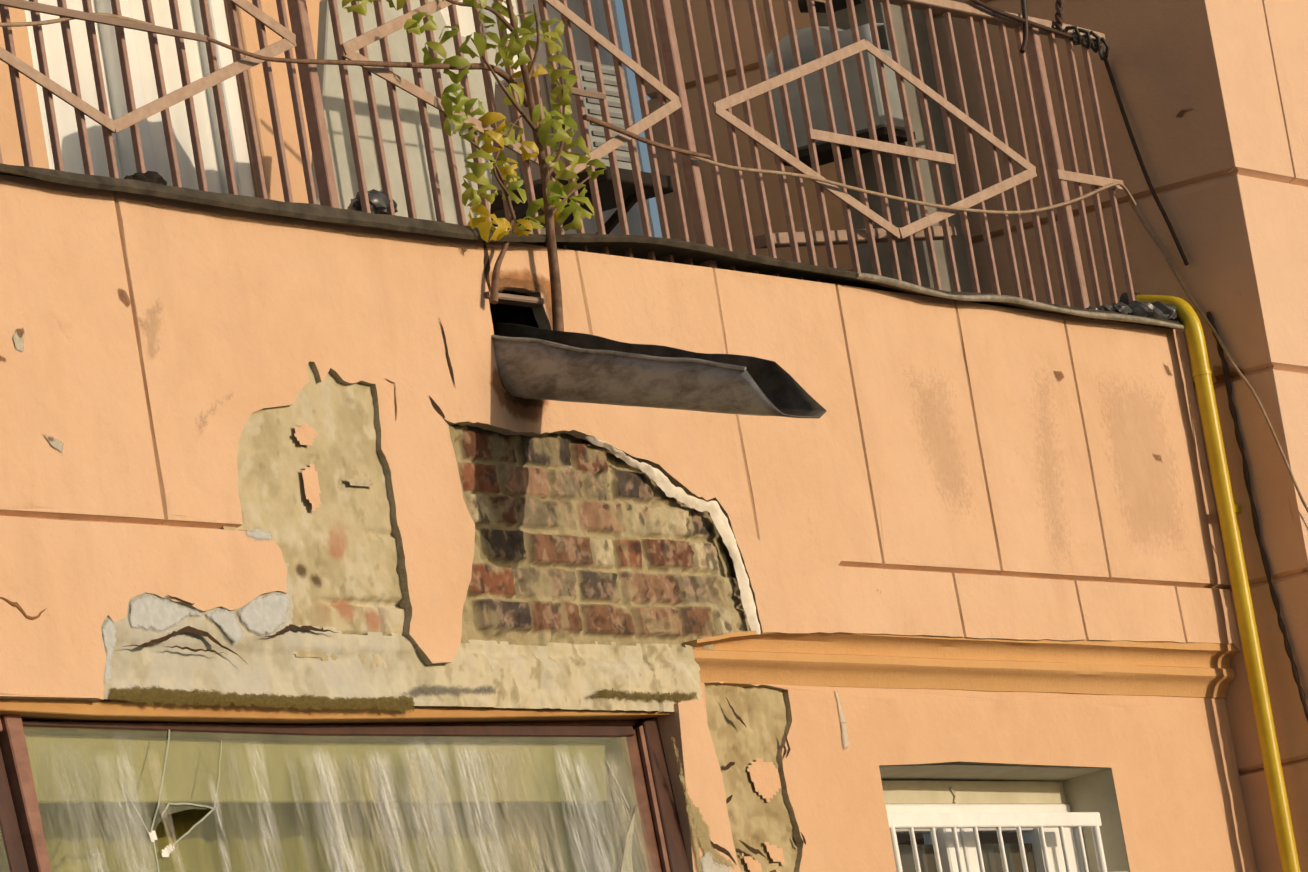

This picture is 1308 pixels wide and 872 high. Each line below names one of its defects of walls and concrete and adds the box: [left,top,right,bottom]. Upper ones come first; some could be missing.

crack [429,318,456,418]
crack [0,597,47,620]
flaking render [448,424,761,650]
spalling [679,684,806,872]